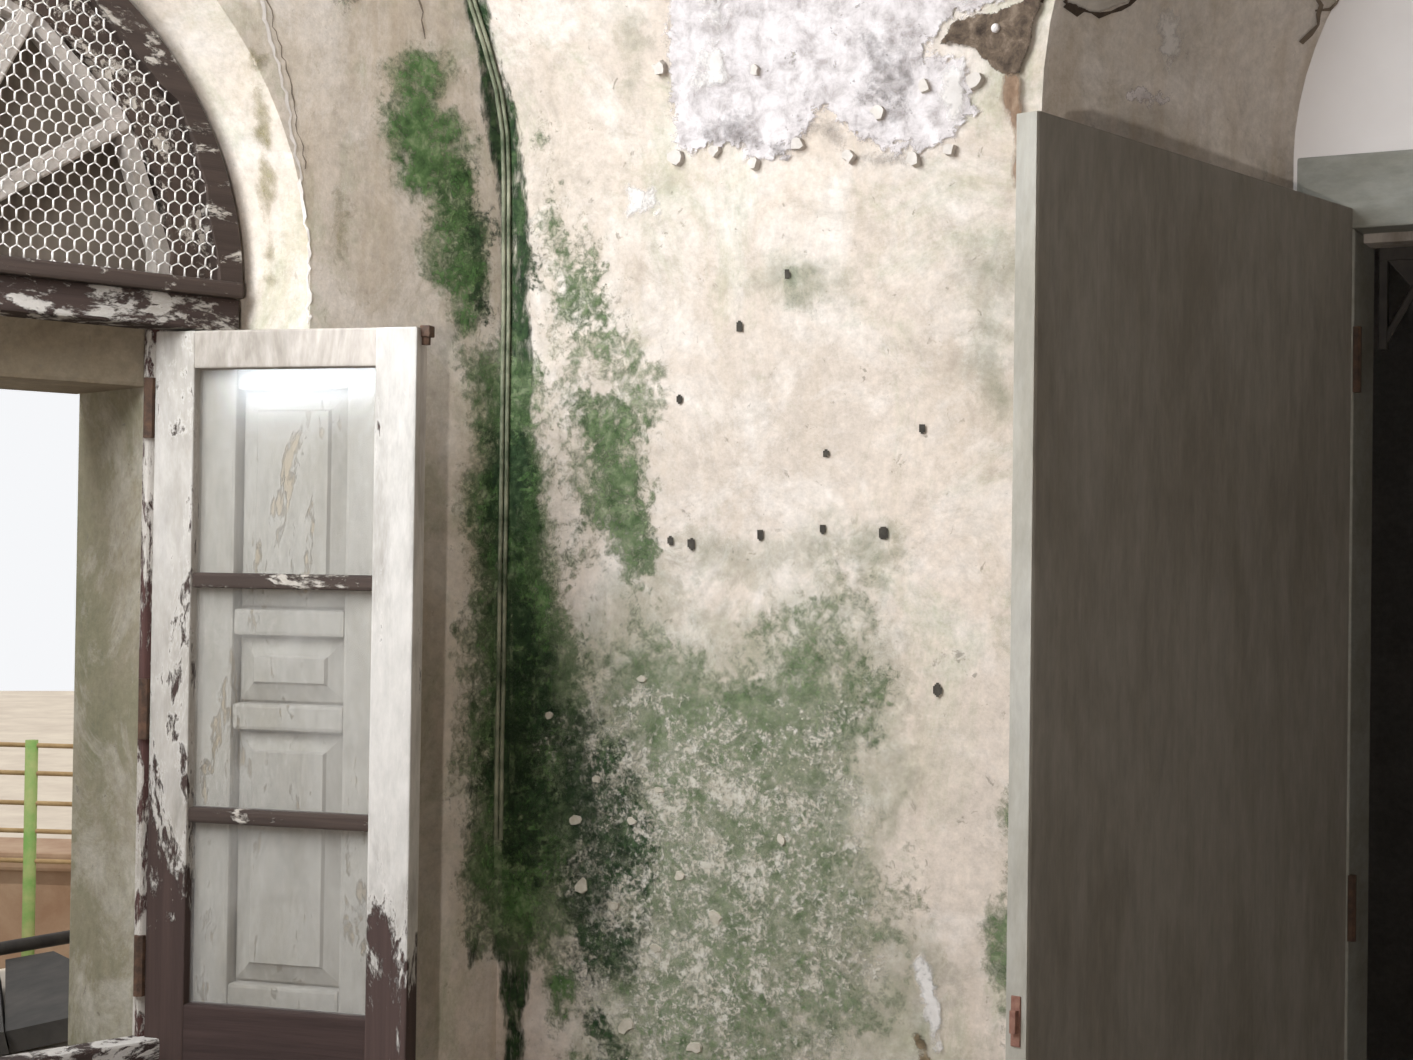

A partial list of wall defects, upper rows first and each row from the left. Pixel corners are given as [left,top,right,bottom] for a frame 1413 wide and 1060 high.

flaking render [652,0,1041,170]
corrosion [1002,75,1022,187]
water stain [380,0,921,1060]
water stain [984,879,1008,989]
peeling [913,956,943,1060]